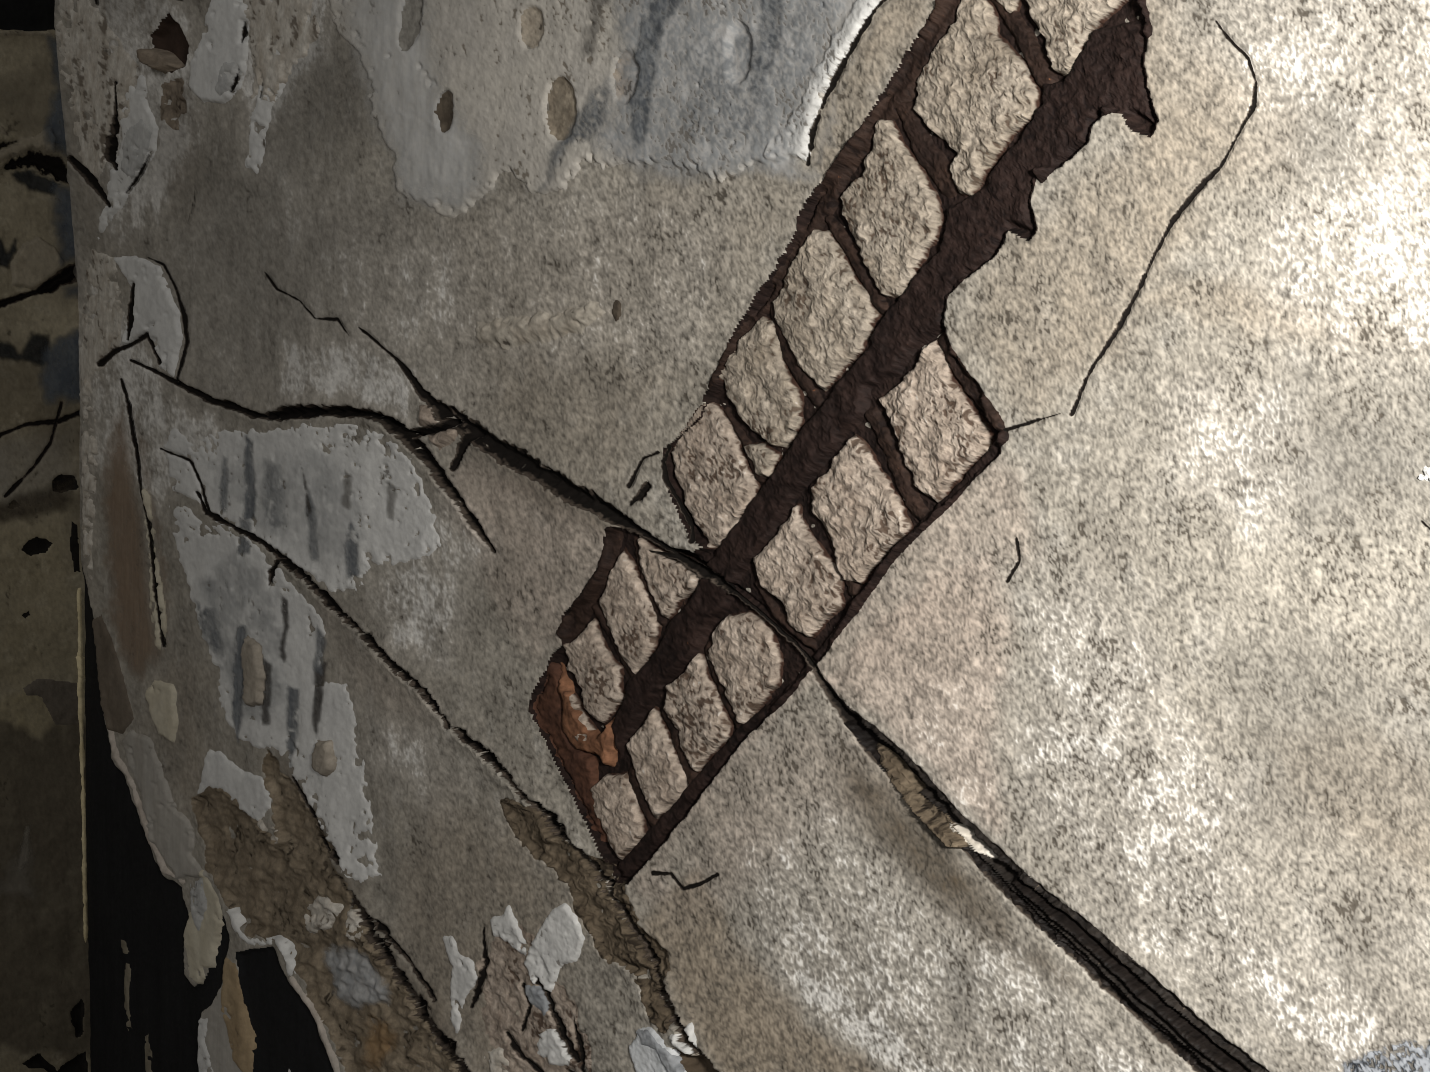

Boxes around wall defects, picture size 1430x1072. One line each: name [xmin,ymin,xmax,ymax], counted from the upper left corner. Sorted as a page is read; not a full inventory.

water stain [551,0,856,177]
spalling [1122,41,1159,137]
crack [0,263,77,308]
crack [1003,21,1258,432]
crack [0,401,80,498]
peeling [0,0,754,1072]
spalling [443,0,1143,1072]
crack [1006,537,1021,583]
peeling [1417,466,1430,482]
crack [96,257,819,1072]
rust [533,662,618,842]